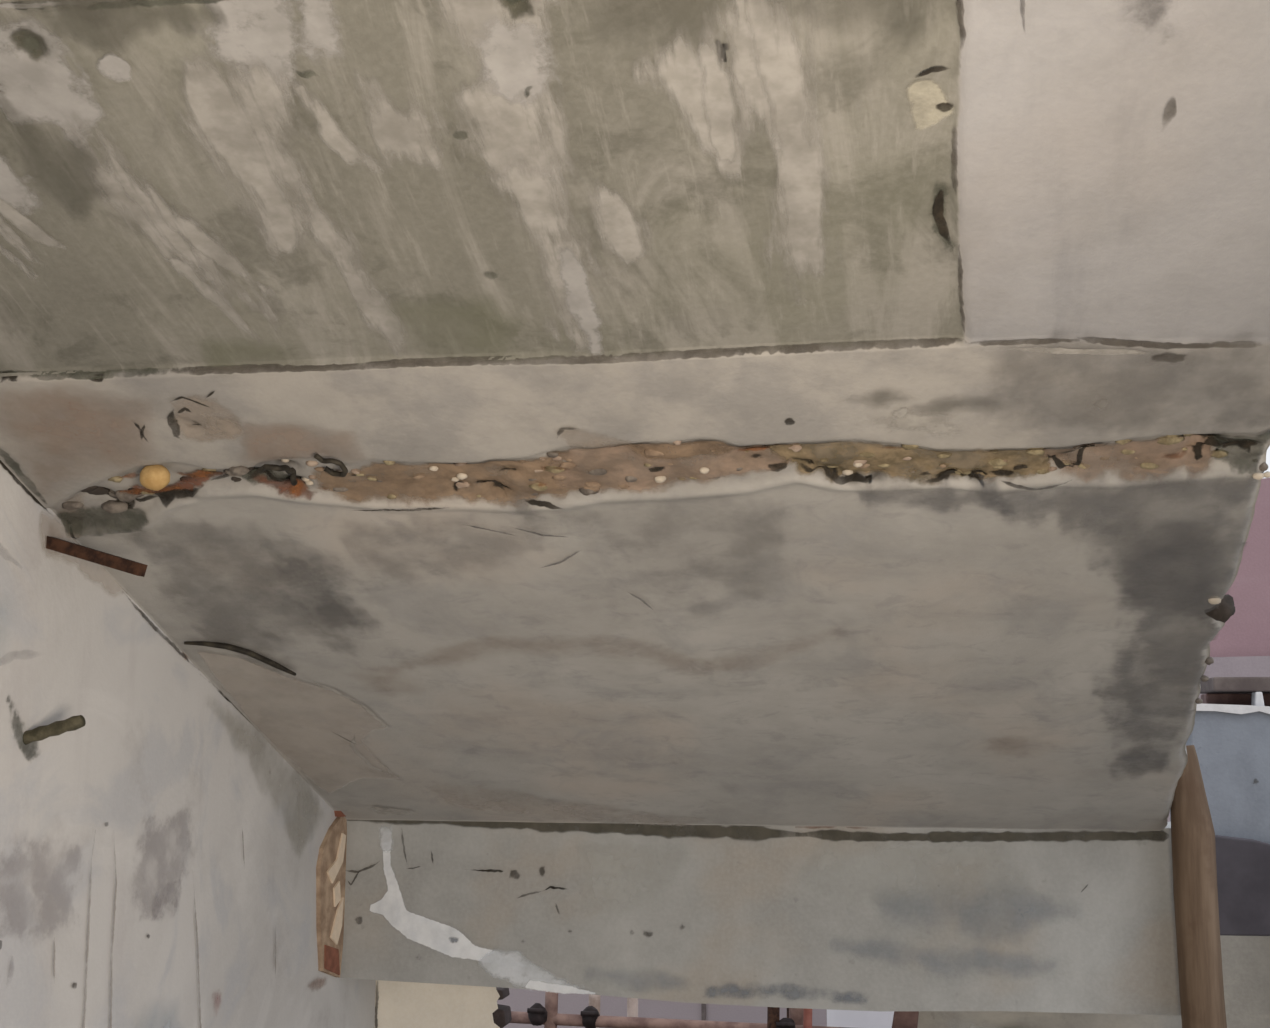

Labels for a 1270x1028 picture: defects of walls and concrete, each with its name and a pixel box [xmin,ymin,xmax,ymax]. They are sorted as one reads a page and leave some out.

crack [956,0,966,39]
crack [1019,0,1027,25]
damp [0,21,277,331]
damp [185,0,440,352]
damp [440,0,602,354]
damp [635,0,826,274]
crack [950,131,958,187]
spalling [753,454,814,472]
spalling [970,465,1028,478]
spalling [1192,434,1258,460]
spalling [42,518,119,593]
rust [15,717,36,758]